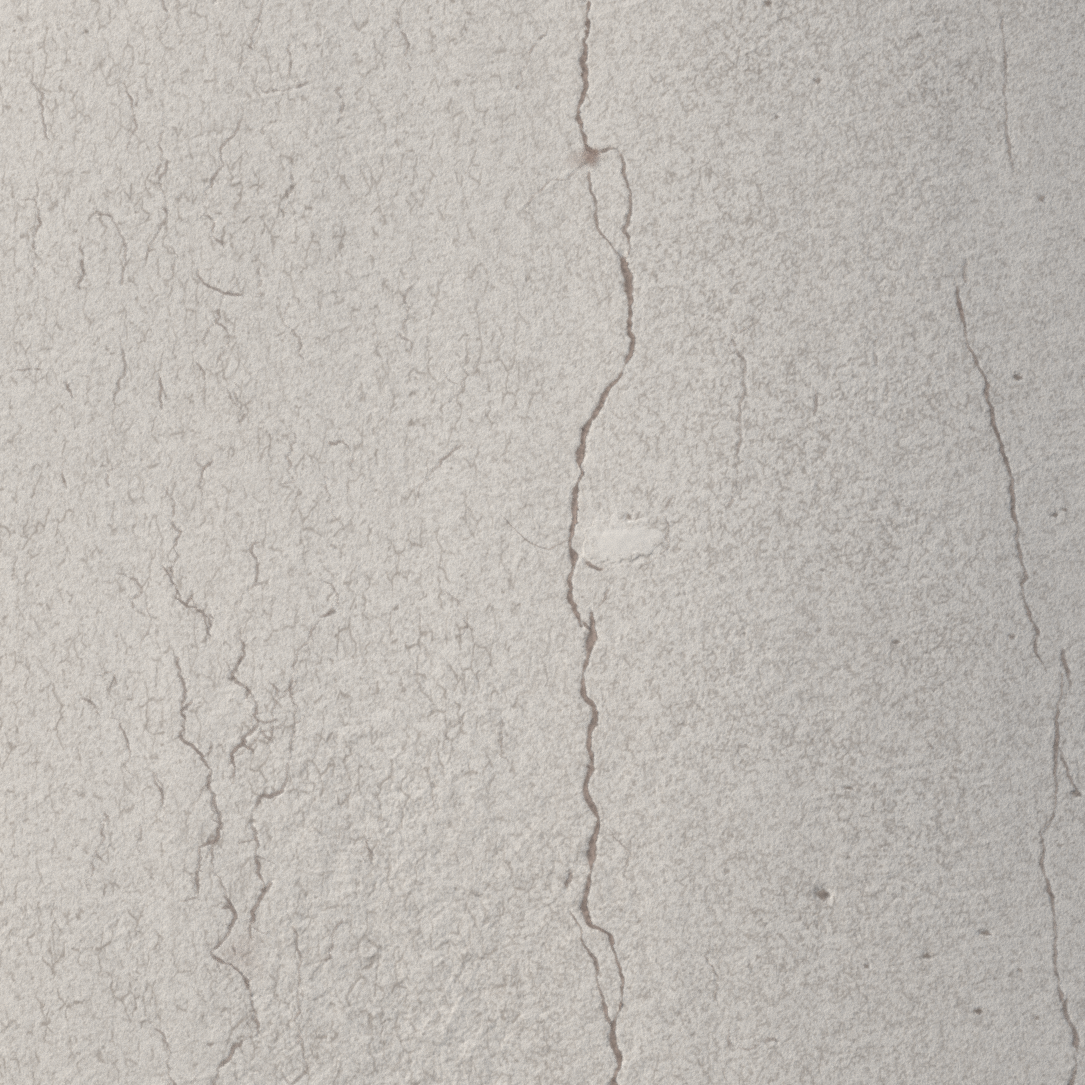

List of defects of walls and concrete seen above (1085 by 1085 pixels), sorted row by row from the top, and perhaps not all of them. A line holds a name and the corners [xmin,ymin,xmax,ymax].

crack [956,288,965,325]
crack [972,353,1017,524]
crack [565,1,635,1085]
crack [180,598,211,636]
crack [1019,553,1070,675]
crack [176,644,258,890]
crack [256,786,284,805]
crack [1053,710,1072,780]
crack [212,836,272,1067]
crack [1040,850,1063,1000]
crack [1071,1028,1079,1048]